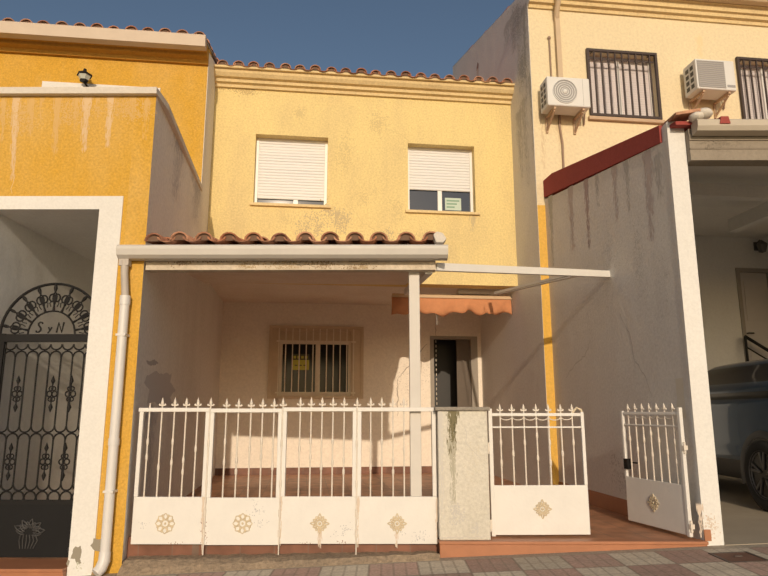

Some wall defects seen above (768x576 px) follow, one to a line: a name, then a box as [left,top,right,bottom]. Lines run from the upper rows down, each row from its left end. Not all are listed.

water stain [0,97,159,181]
water stain [503,1,546,184]
water stain [602,149,670,319]
water stain [438,411,487,534]
spalling [66,538,101,567]